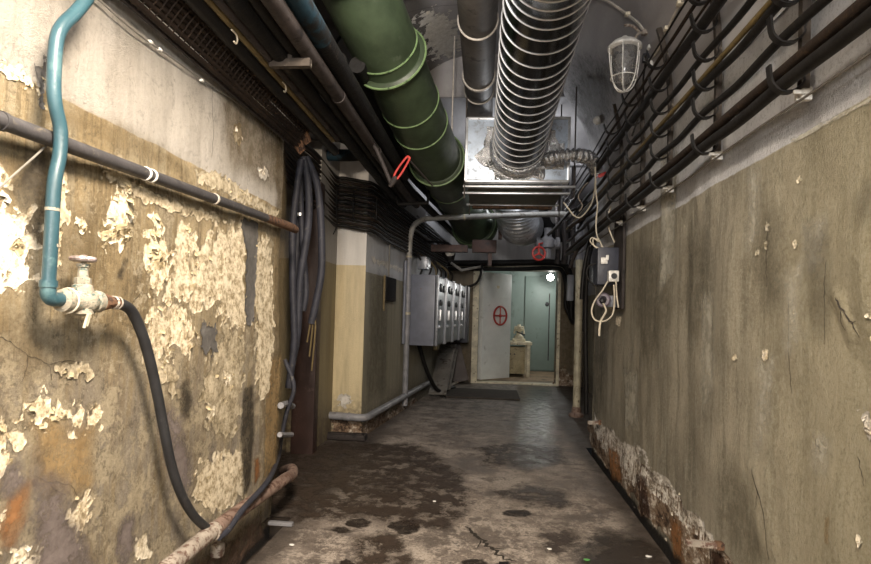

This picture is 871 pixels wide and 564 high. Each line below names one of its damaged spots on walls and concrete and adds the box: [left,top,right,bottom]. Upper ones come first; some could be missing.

peeling [0,55,48,111]
peeling [0,164,44,294]
crack [0,337,79,382]
peeling [54,164,279,519]
water stain [226,93,467,564]
crack [824,262,859,340]
peeling [0,385,104,479]
peeling [0,545,44,564]
peeling [65,488,95,542]
crack [438,513,513,561]
rust [636,475,651,518]
rust [709,549,729,564]